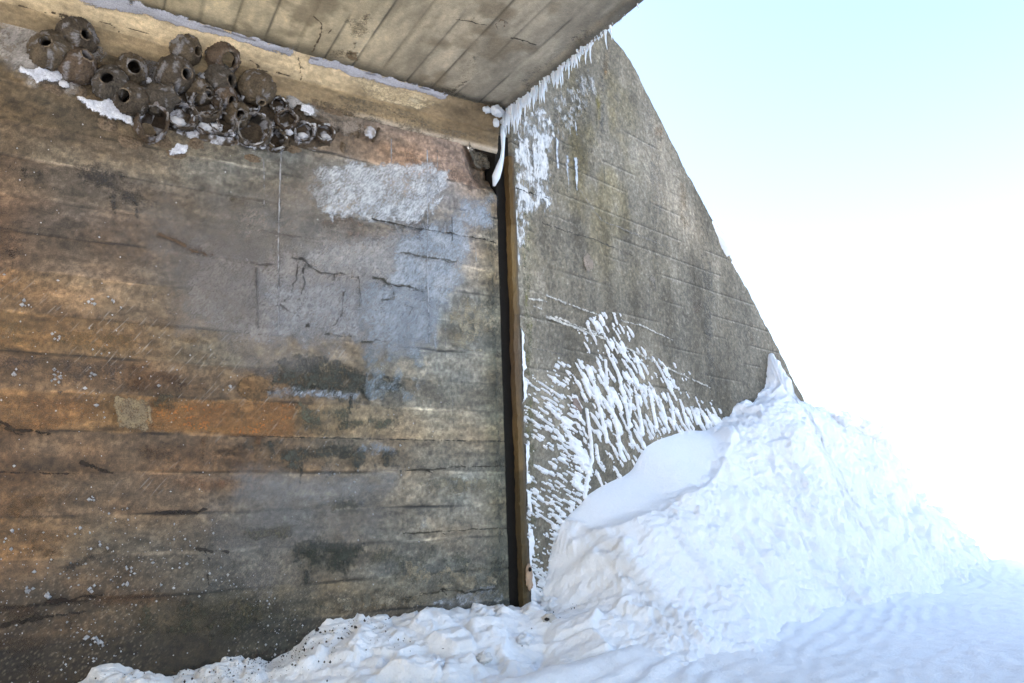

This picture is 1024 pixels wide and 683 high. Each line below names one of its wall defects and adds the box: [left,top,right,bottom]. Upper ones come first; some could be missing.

crack [250,229,423,343]